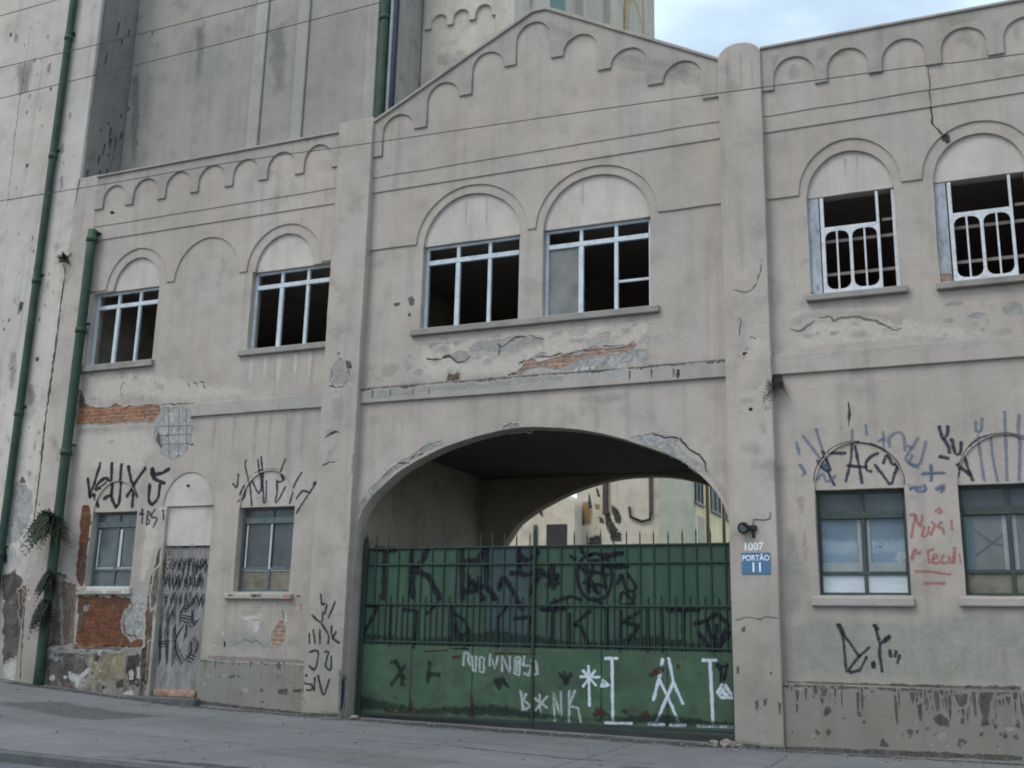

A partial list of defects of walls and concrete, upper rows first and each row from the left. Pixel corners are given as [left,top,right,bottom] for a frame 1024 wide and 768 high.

crack [928,68,950,144]
peeling [355,317,666,402]
flaking render [74,373,198,467]
spalling [624,427,707,473]
flaking render [1,472,48,683]
flaking render [45,500,170,696]
spalling [237,607,289,647]
leakage [735,492,1024,763]